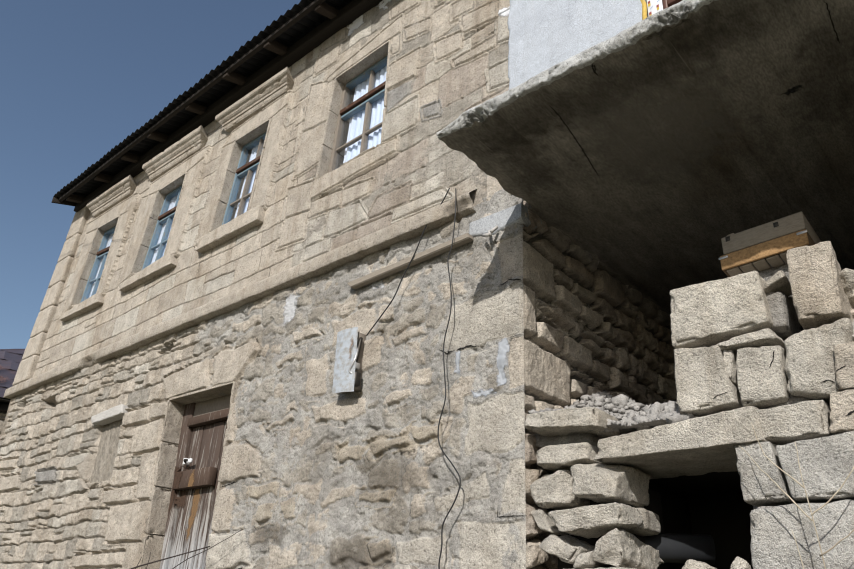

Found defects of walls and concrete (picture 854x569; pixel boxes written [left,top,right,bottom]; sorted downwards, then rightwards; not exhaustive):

crack [549,105,600,178]